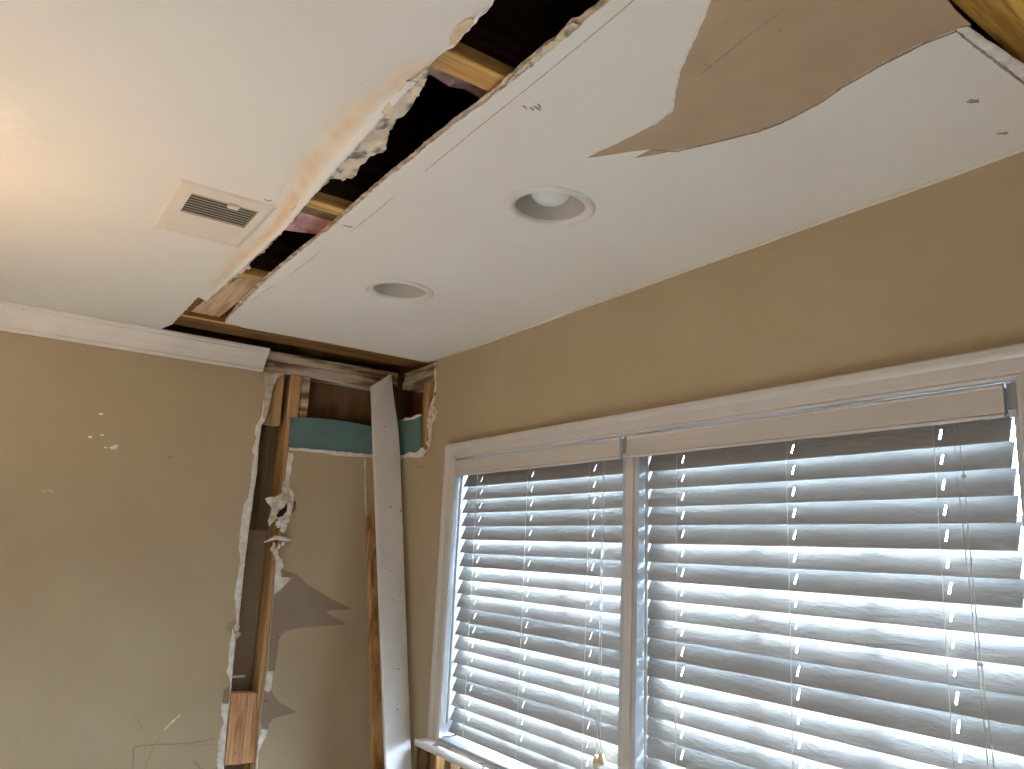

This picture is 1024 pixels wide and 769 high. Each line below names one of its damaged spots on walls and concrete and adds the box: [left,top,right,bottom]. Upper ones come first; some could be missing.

peeling [500,22,580,90]
peeling [587,0,971,158]
leakage [194,52,438,300]
peeling [269,569,352,671]
peeling [261,691,296,729]